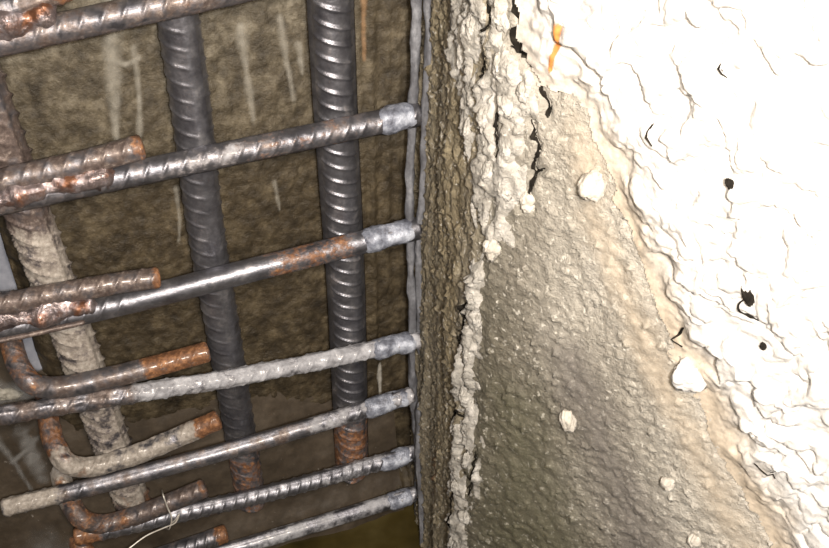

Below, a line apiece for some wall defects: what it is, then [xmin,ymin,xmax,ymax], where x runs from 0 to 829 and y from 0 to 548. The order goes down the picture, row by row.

spalling [157,13,216,151]
spalling [307,0,358,123]
crack [479,4,491,78]
crack [492,112,500,157]
crack [509,0,559,210]
spalling [3,206,77,287]
spalling [180,169,229,272]
spalling [316,139,363,239]
spalling [0,254,421,517]
crack [671,327,684,347]
crack [737,300,759,321]
crack [446,451,477,538]